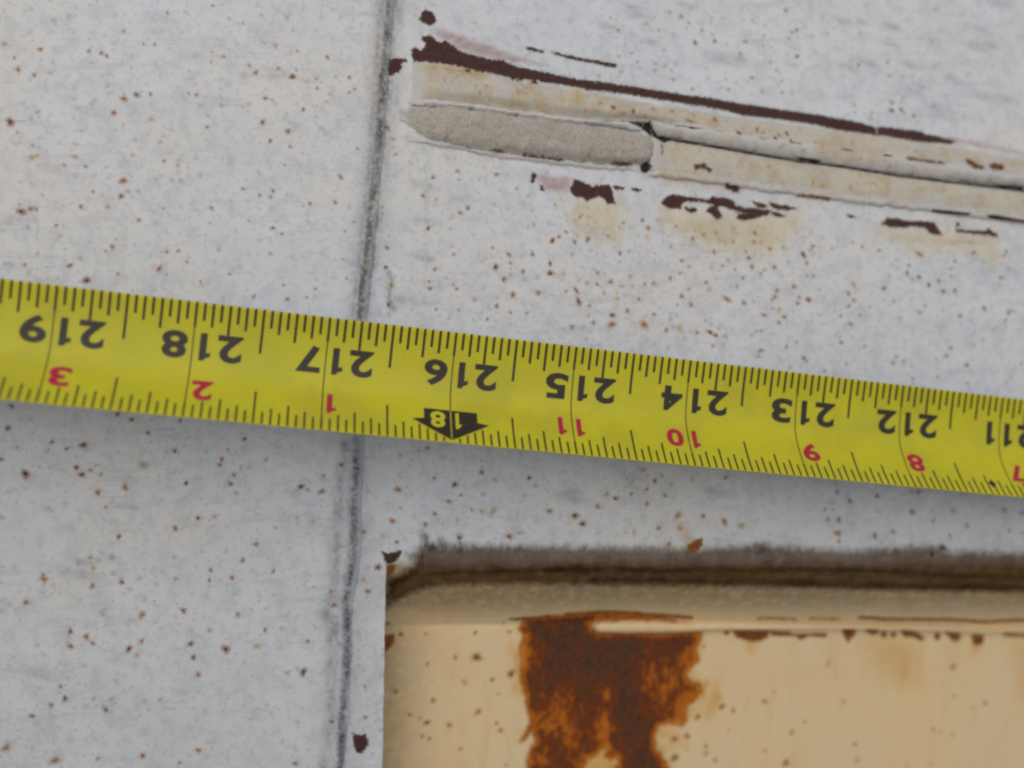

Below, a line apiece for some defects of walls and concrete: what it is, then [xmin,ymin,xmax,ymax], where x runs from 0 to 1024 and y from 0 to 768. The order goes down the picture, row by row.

peeling [387,10,956,145]
peeling [570,179,642,204]
peeling [661,185,797,220]
peeling [882,217,942,235]
peeling [956,222,998,237]
rust [509,613,704,768]